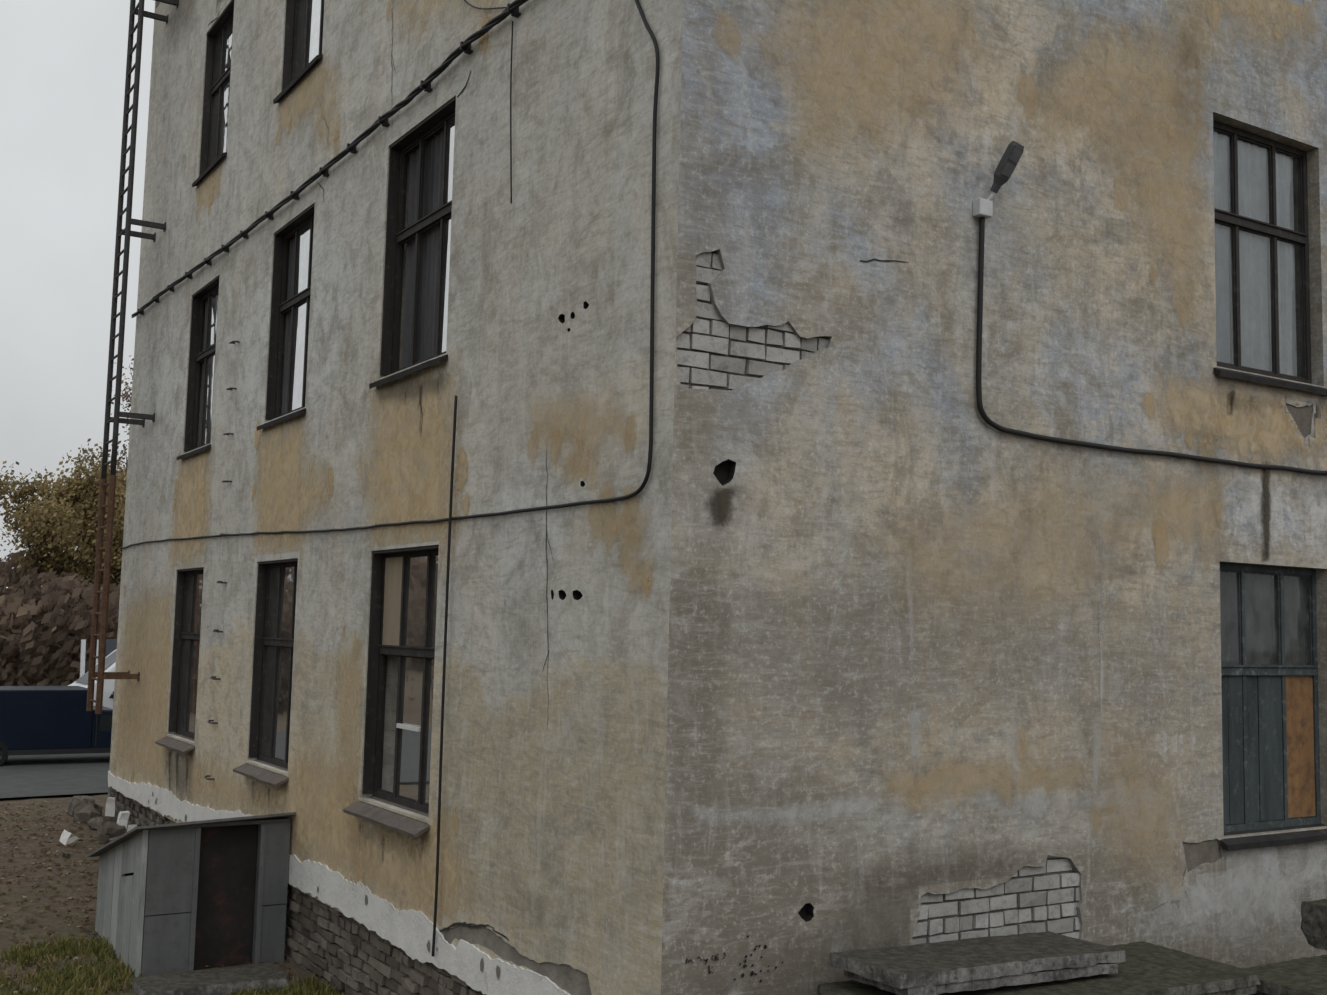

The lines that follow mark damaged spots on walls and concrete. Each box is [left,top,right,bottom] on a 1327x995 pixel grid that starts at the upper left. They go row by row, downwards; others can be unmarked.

spalling [676,249,832,391]
peeling [108,752,592,995]
spalling [730,935,783,995]
spalling [912,855,1083,945]